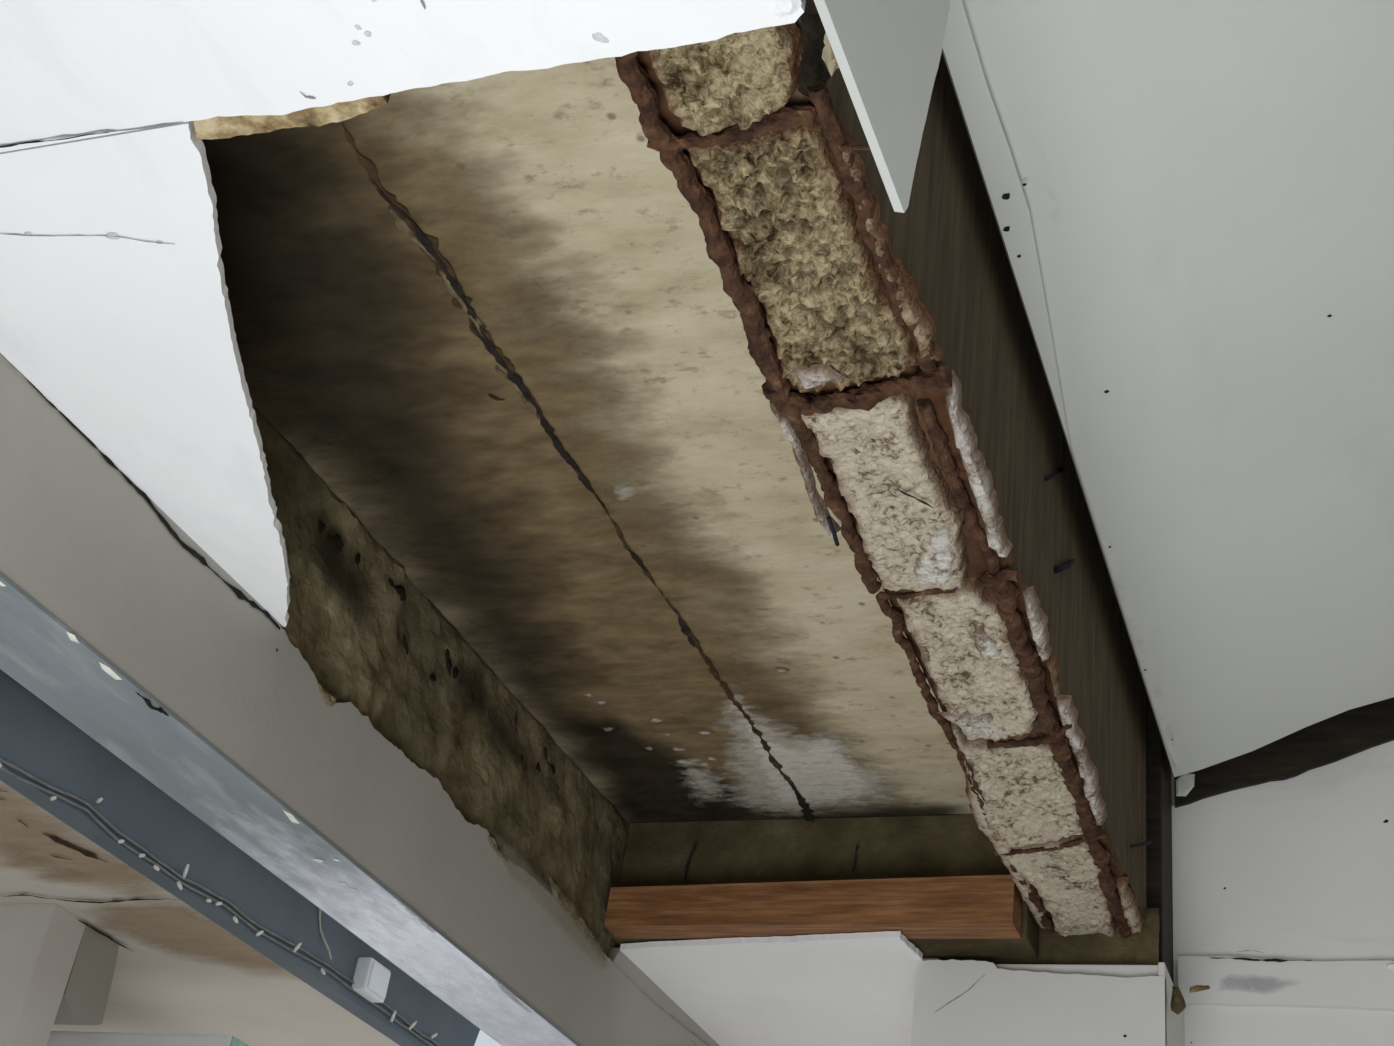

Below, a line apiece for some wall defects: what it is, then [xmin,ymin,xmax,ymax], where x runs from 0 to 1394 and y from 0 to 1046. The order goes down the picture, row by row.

crack [0,122,183,148]
spalling [194,82,391,141]
rust [637,51,720,223]
crack [0,353,280,630]
damp [194,95,953,824]
crack [342,125,814,821]
rust [923,388,985,531]
spalling [389,578,406,601]
rust [992,549,1062,727]
damp [0,793,149,883]
damp [106,908,281,969]
flaking render [549,876,606,961]